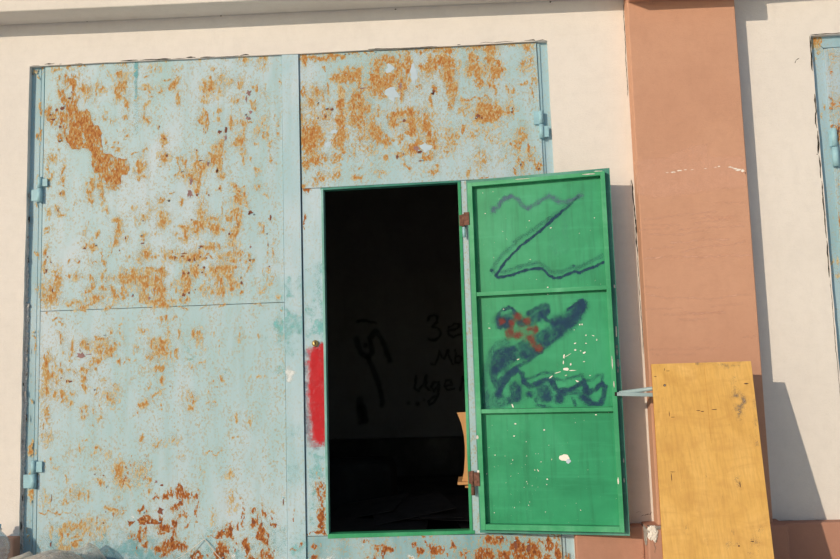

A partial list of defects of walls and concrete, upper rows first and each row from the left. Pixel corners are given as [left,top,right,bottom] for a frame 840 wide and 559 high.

corrosion [811,37,840,79]
corrosion [299,43,543,194]
corrosion [820,91,840,148]
corrosion [26,56,281,559]
corrosion [290,468,327,559]
corrosion [363,533,574,559]